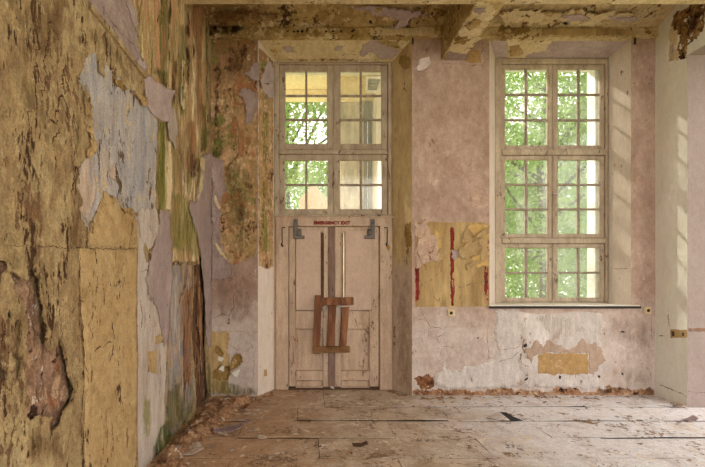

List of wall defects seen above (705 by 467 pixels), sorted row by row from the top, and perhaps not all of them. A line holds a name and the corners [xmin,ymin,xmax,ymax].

leakage [210,11,272,36]
peeling [445,1,641,63]
spalling [0,260,78,431]
spalling [77,0,274,467]
peeling [404,219,654,396]